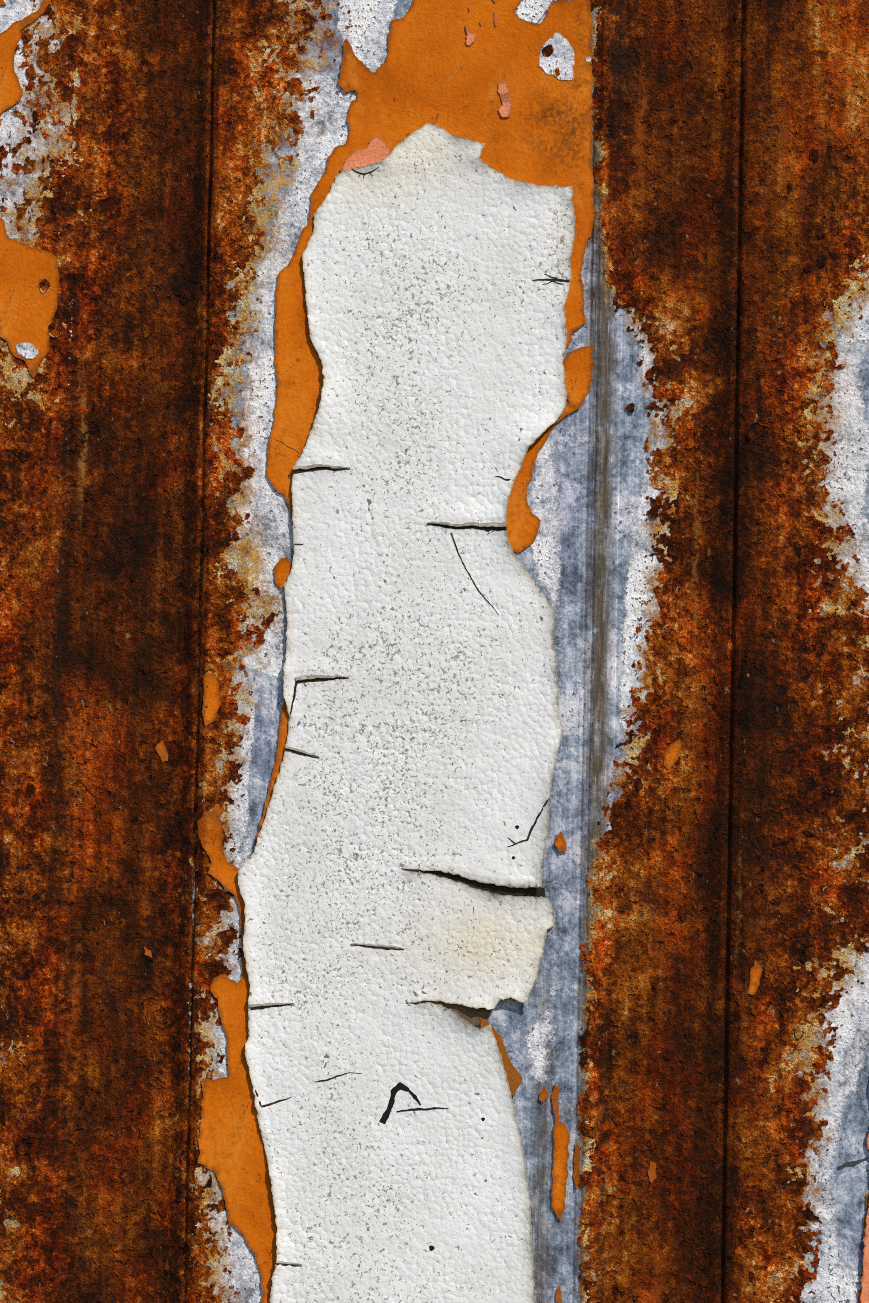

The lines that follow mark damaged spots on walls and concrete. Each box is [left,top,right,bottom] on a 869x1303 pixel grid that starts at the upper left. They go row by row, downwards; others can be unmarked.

peeling [0,0,51,126]
rust [516,0,556,23]
peeling [0,218,59,378]
crack [427,521,507,615]
rust [526,438,565,646]
rust [0,0,397,1303]
crack [290,675,349,714]
peeling [238,123,594,1303]
rust [539,0,869,1303]
crack [401,868,545,897]
crack [406,1000,490,1026]
peeling [857,1192,869,1303]